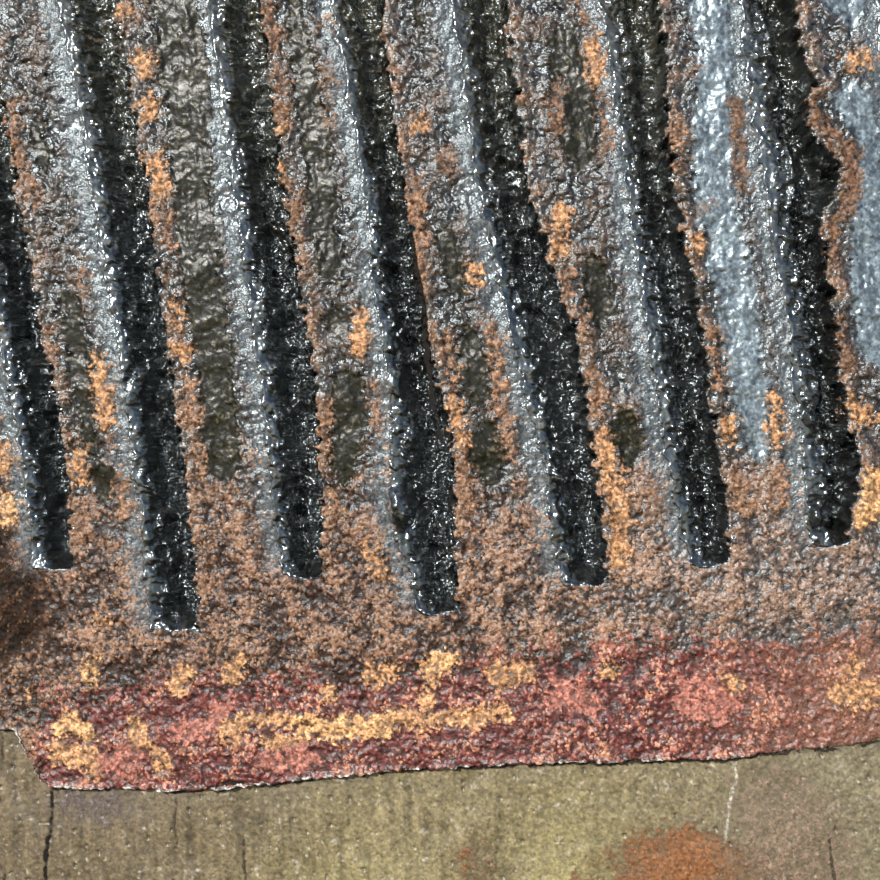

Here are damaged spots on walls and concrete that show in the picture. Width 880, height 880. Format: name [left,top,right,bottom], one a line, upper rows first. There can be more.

rust [141,146,179,254]
rust [544,201,596,333]
rust [88,348,120,450]
rust [437,327,484,515]
rust [582,362,671,576]
rust [853,467,880,532]
peeling [11,604,880,792]
crack [43,788,142,880]
crack [166,778,322,844]
crack [345,768,432,779]
crack [455,747,836,770]
crack [828,839,836,880]